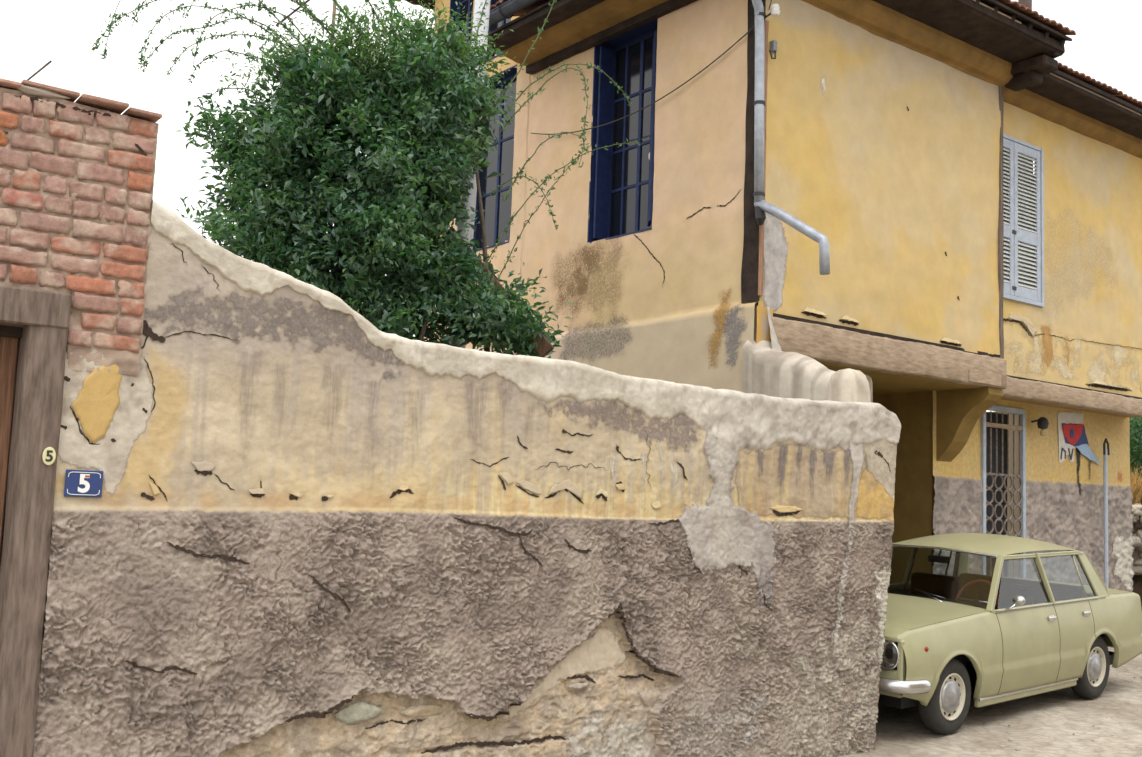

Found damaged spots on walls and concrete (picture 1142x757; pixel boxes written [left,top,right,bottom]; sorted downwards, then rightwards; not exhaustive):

crack [686,189,742,219]
crack [632,232,665,285]
crack [141,320,233,349]
water stain [554,245,628,360]
water stain [709,292,745,366]
peeling [58,349,156,494]
spalling [595,481,625,501]
water stain [544,400,697,493]
water stain [735,443,867,518]
spalling [218,603,679,757]